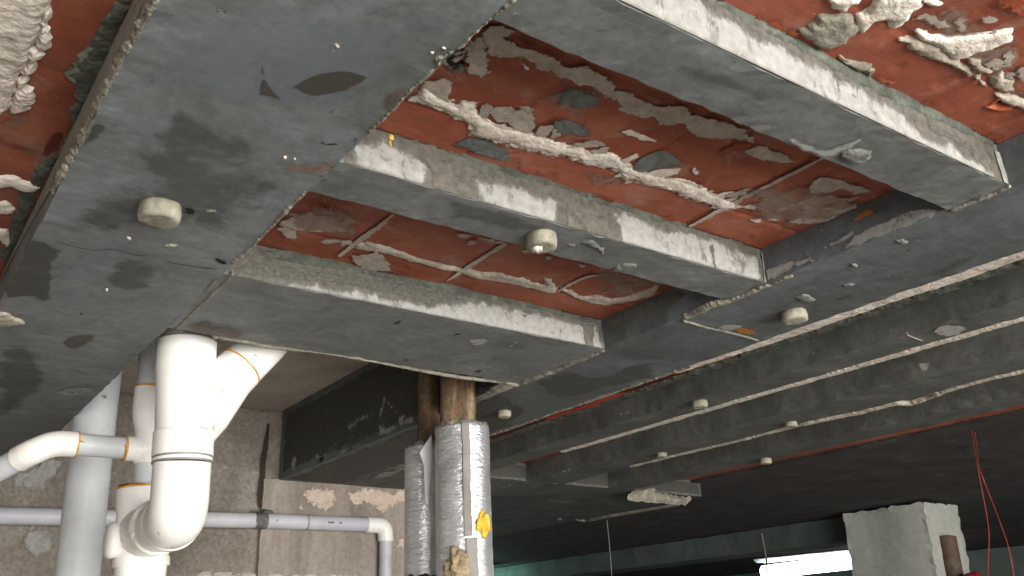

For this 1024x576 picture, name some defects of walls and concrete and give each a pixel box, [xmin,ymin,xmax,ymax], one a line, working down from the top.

spalling [755,15,800,39]
peeling [0,7,53,114]
peeling [828,0,1024,112]
leakage [294,71,367,96]
leakage [4,241,58,301]
peeling [298,487,404,513]
spalling [627,488,691,505]